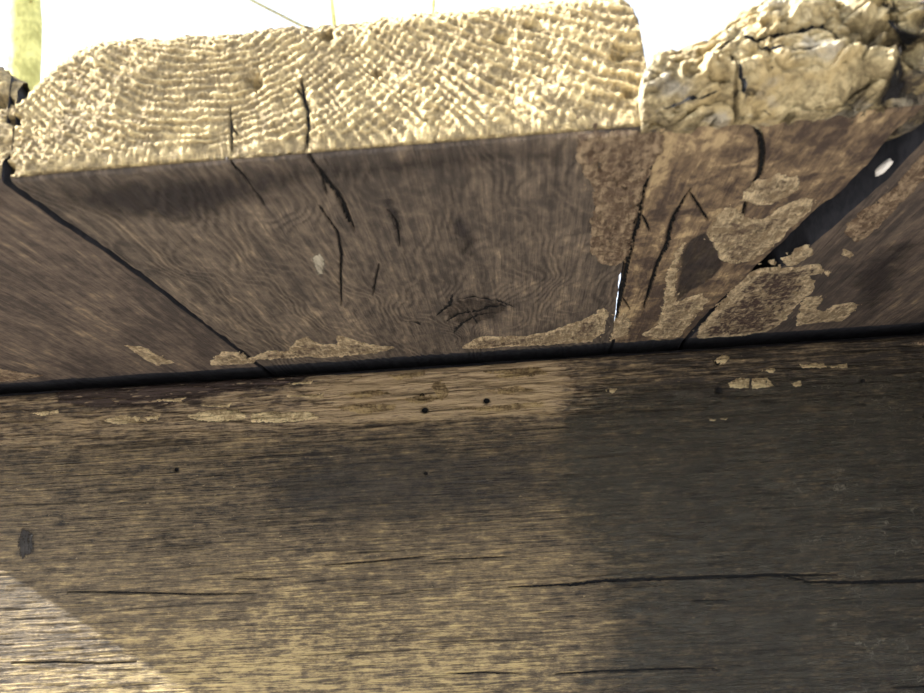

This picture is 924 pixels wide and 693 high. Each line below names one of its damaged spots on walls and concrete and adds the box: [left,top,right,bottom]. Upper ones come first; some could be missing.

crack [230,110,265,204]
crack [297,83,355,303]
peeling [576,123,666,266]
crack [742,126,766,213]
crack [615,182,708,318]
peeling [642,173,862,339]
peeling [210,335,394,366]
crack [405,294,514,333]
peeling [462,308,632,349]
peeling [728,368,775,390]
crack [81,578,264,595]
crack [509,574,924,601]